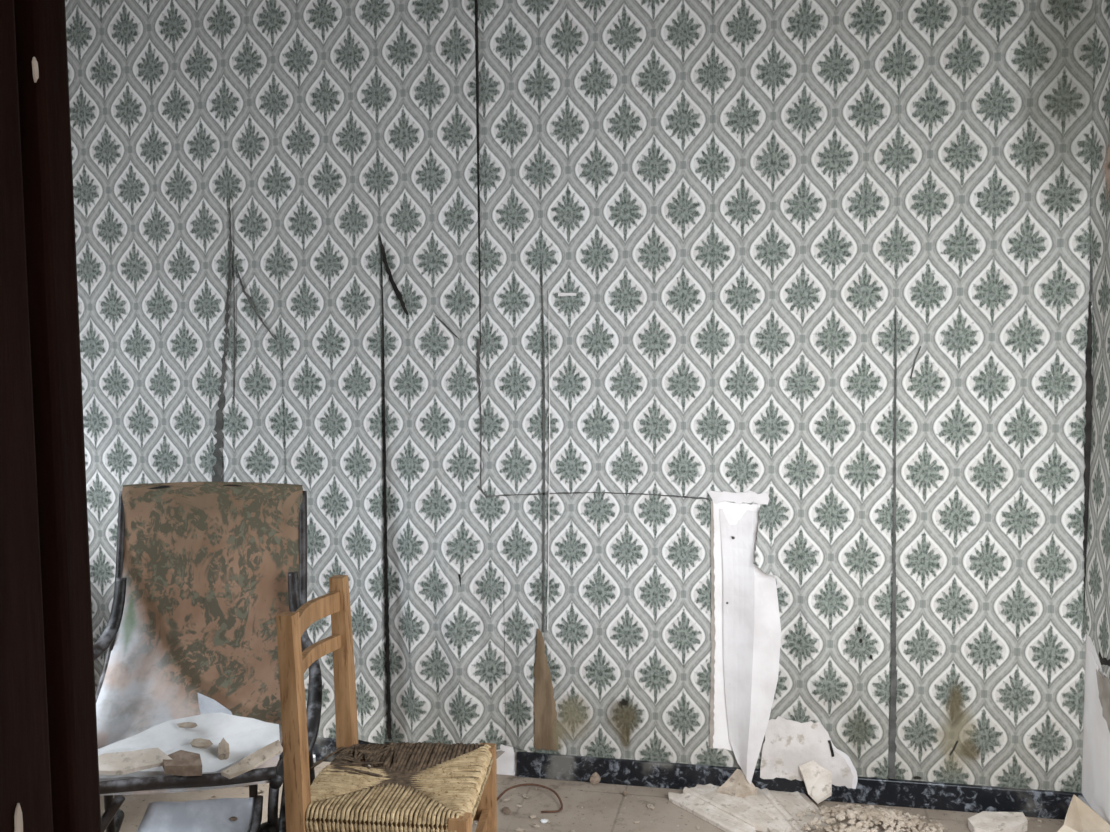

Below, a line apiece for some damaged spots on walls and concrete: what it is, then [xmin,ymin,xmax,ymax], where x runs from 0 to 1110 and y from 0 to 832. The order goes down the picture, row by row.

damp [950,687,961,721]
damp [949,741,978,758]
flaking render [1089,650,1110,821]